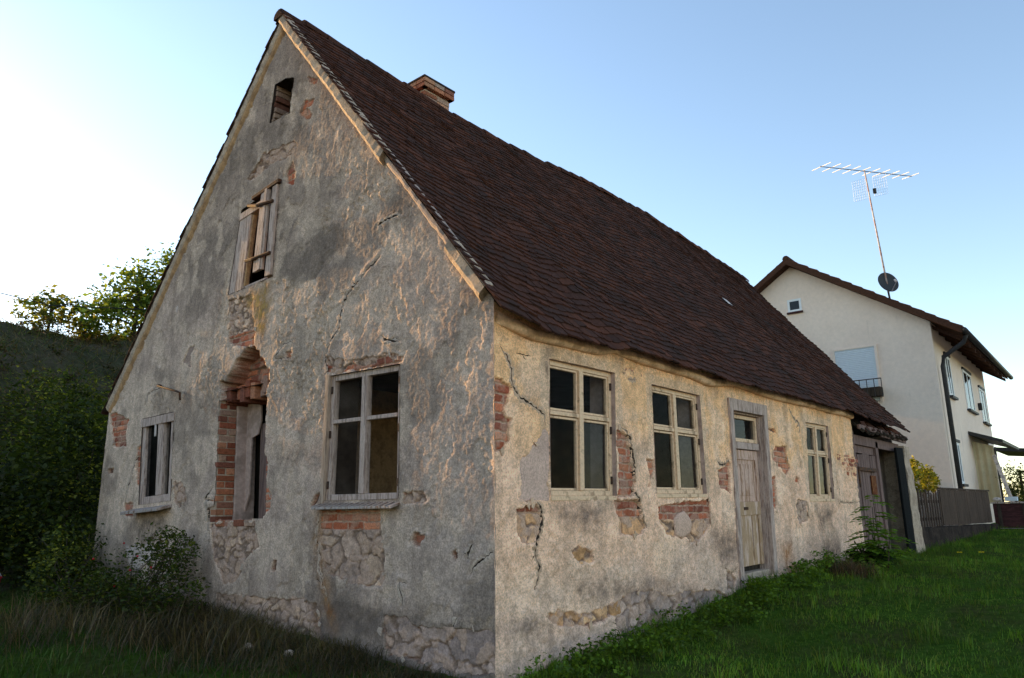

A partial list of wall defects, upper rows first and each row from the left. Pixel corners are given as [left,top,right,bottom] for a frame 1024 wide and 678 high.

spalling [227,295,270,388]
crack [325,256,380,370]
spalling [111,413,141,484]
spalling [494,379,509,456]
crack [500,346,546,422]
spalling [614,424,644,540]
spalling [772,447,800,512]
spalling [311,491,385,586]
crack [532,501,545,589]
spalling [658,496,714,546]
spalling [546,572,736,637]
spalling [377,615,496,675]